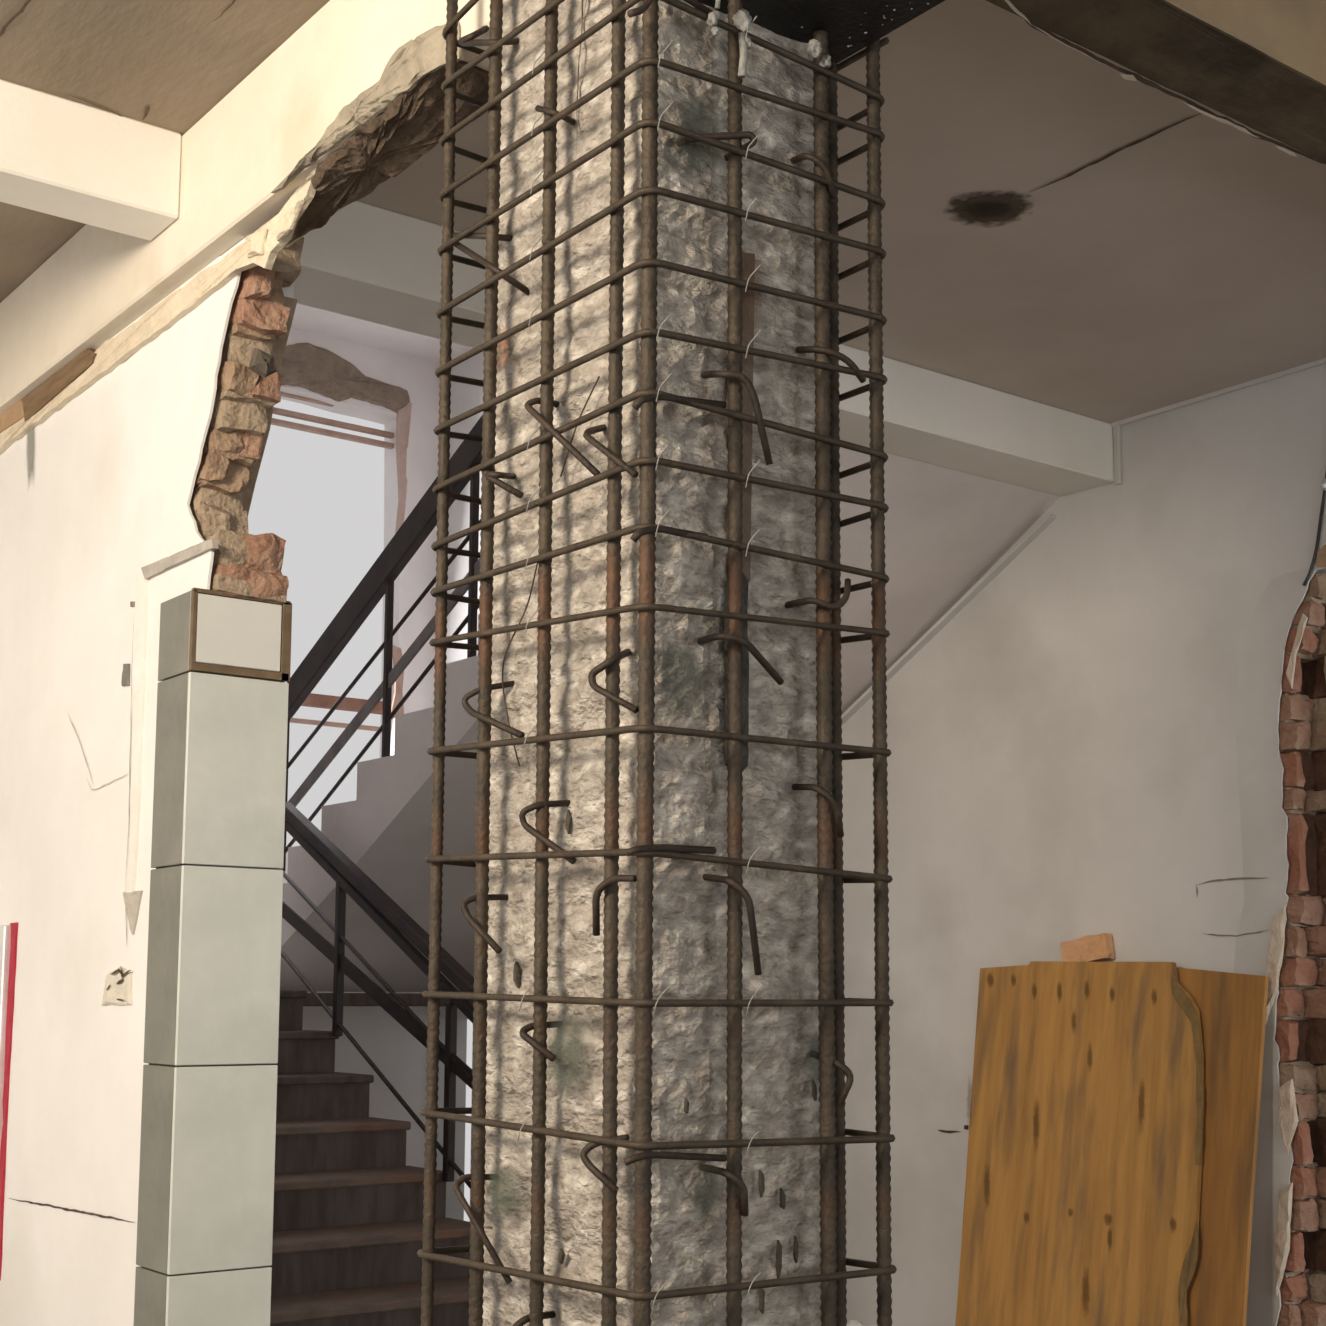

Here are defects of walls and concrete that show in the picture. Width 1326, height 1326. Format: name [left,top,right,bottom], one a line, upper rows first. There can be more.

crack [0,0,31,37]
crack [1004,0,1326,193]
leakage [948,192,1029,226]
flaking render [0,21,489,603]
crack [67,713,128,790]
crack [1196,877,1264,894]
crack [1202,929,1268,937]
flaking render [1234,543,1326,1326]
crack [9,1198,131,1222]